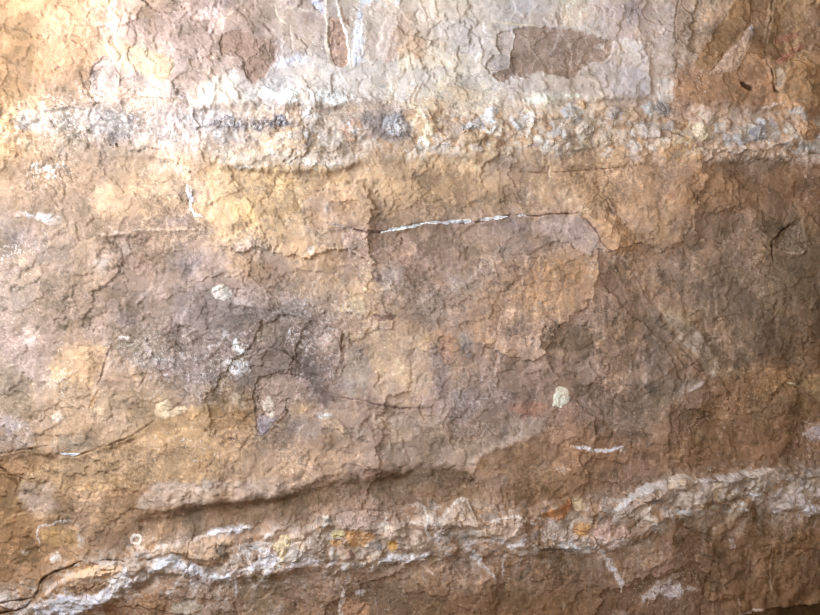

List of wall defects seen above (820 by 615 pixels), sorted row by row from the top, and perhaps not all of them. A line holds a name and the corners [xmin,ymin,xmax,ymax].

spalling [485,24,615,82]
crack [750,0,782,93]
crack [770,211,800,262]
crack [328,212,708,377]
crack [0,419,155,494]
damp [724,480,820,520]
damp [204,523,257,539]
crack [0,558,125,615]
damp [29,566,144,615]
damp [147,545,339,601]
damp [555,534,634,593]
damp [633,572,699,606]